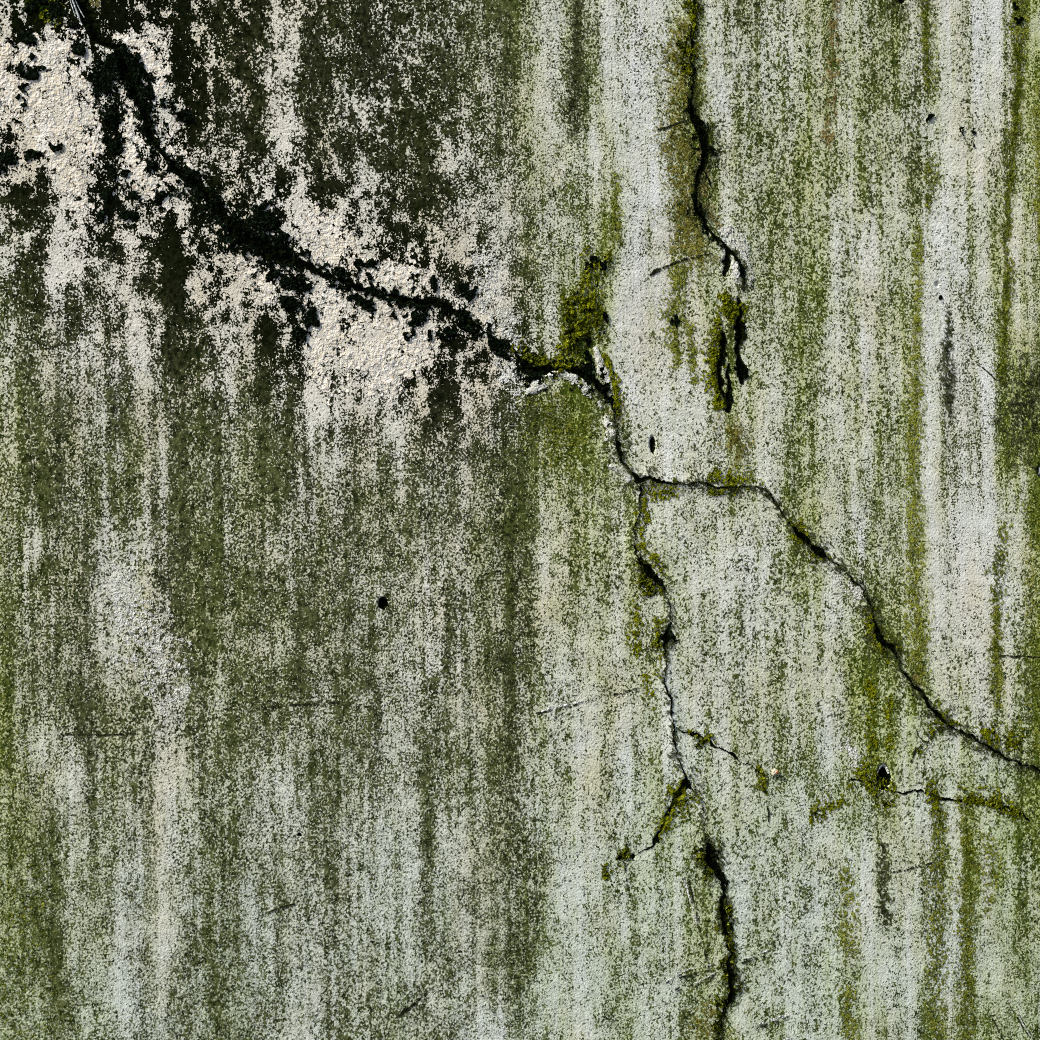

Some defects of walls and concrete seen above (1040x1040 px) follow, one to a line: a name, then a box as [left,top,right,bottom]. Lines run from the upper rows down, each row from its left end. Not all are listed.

leakage [0,26,46,107]
crack [14,0,79,29]
leakage [648,9,721,385]
crack [57,0,1040,873]
leakage [896,224,961,686]
leakage [980,0,1040,762]
leakage [469,379,599,1013]
crack [266,903,295,913]
crack [396,992,427,1018]
crack [600,861,615,881]
crack [688,812,749,1040]
leakage [920,803,1007,1040]